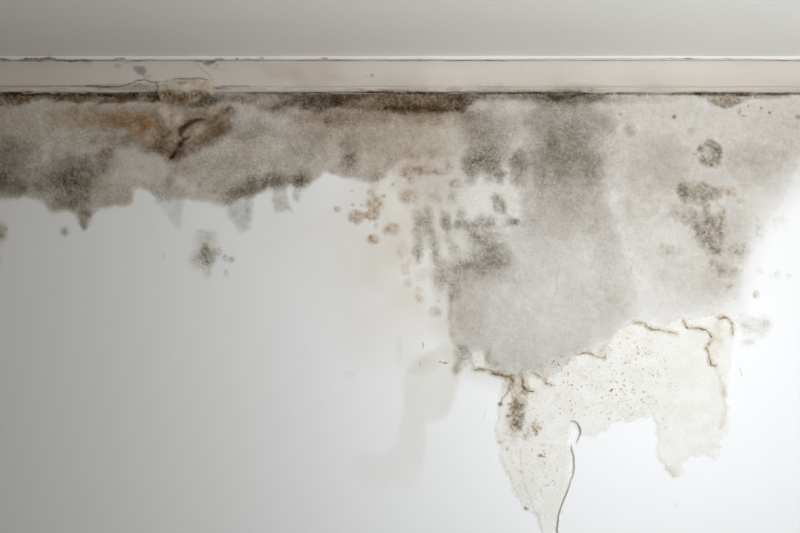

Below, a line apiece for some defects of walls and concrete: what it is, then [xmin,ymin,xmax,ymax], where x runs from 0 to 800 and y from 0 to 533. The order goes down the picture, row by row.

peeling [496,315,734,533]